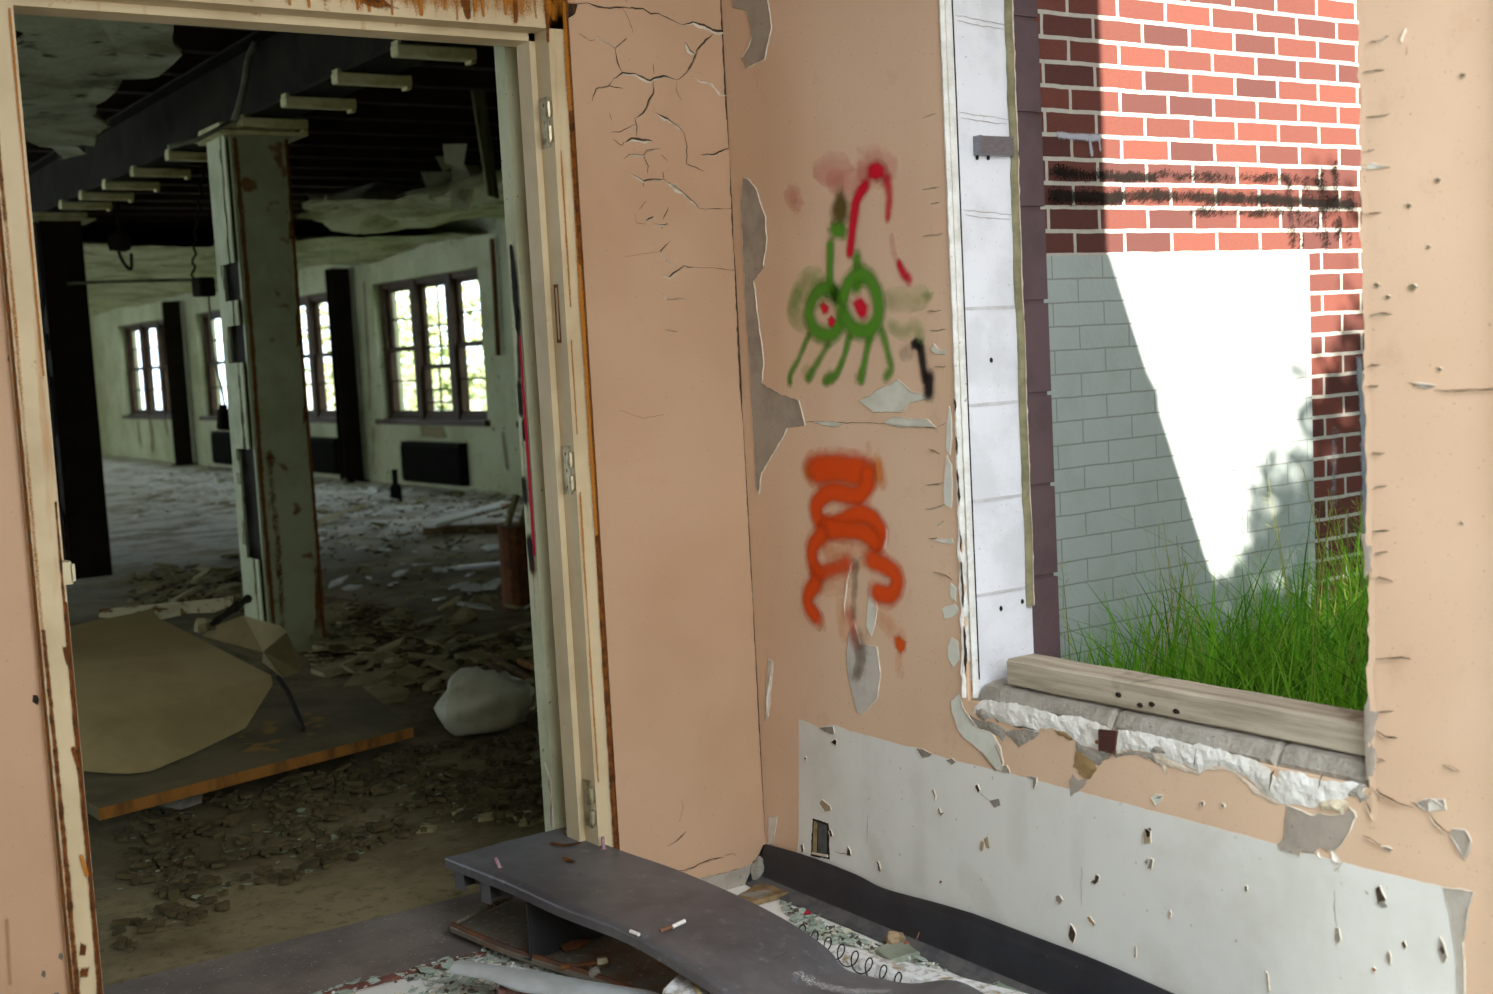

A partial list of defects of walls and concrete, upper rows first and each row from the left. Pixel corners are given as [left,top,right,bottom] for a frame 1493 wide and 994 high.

peeling [732,0,772,69]
peeling [421,144,482,214]
peeling [740,177,843,495]
crack [577,0,765,877]
flaking render [859,0,1392,871]
peeling [1412,798,1447,812]
peeling [1449,828,1472,860]